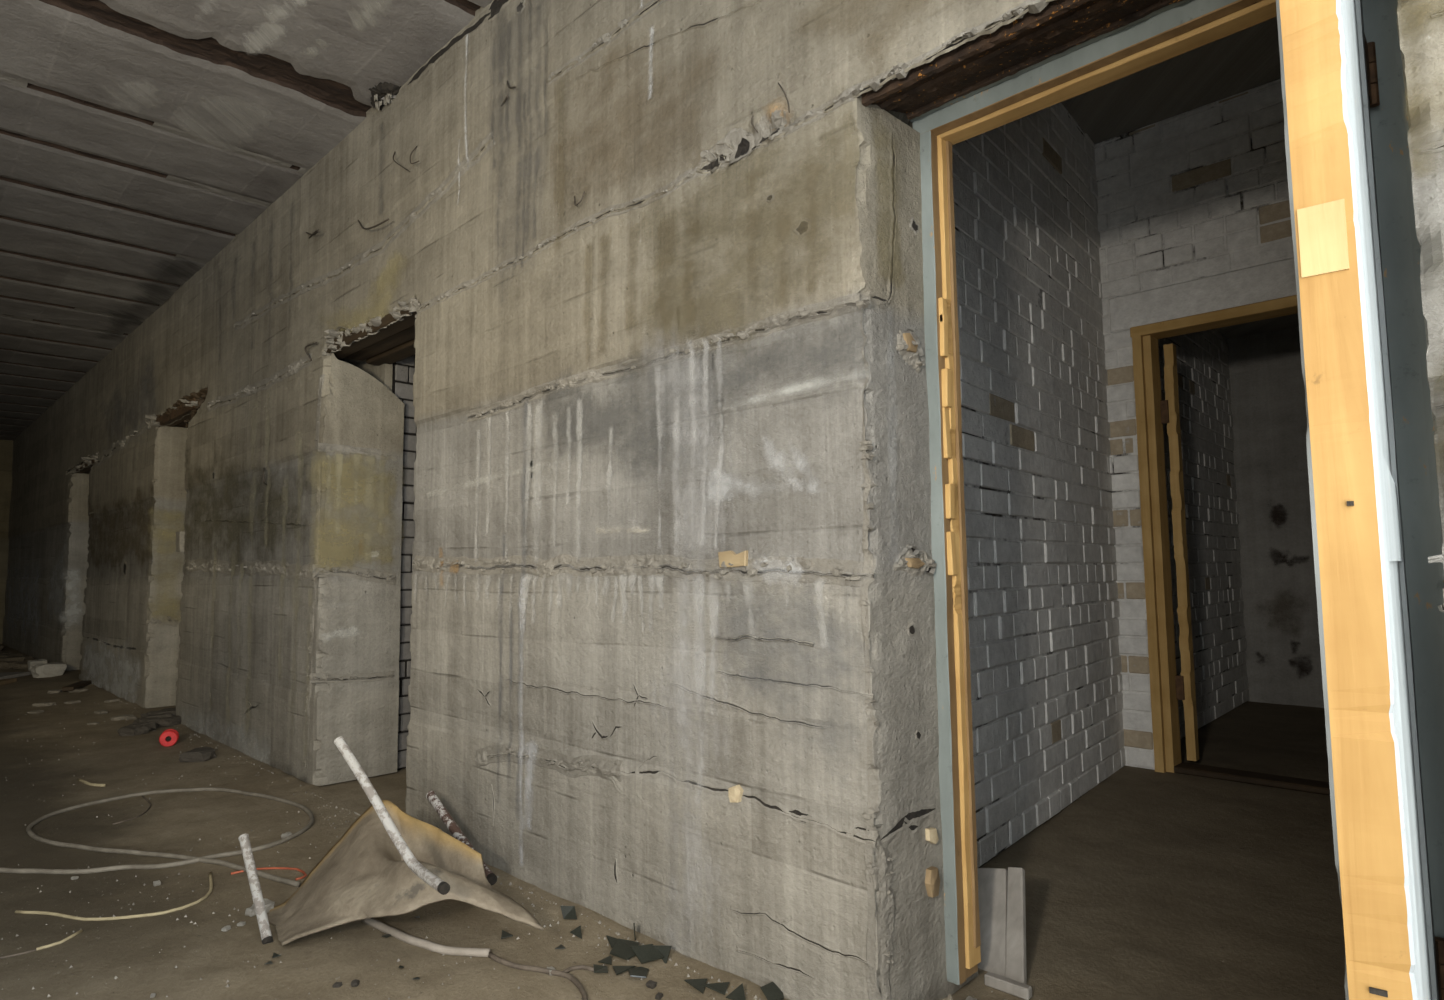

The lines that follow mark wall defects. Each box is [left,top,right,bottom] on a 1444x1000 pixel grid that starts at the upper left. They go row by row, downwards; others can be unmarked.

spalling [687,107,813,179]
spalling [909,217,919,235]
spalling [322,297,420,357]
spalling [896,329,925,374]
spalling [131,387,254,436]
water stain [549,360,745,468]
spalling [893,544,937,577]
crack [477,634,936,848]